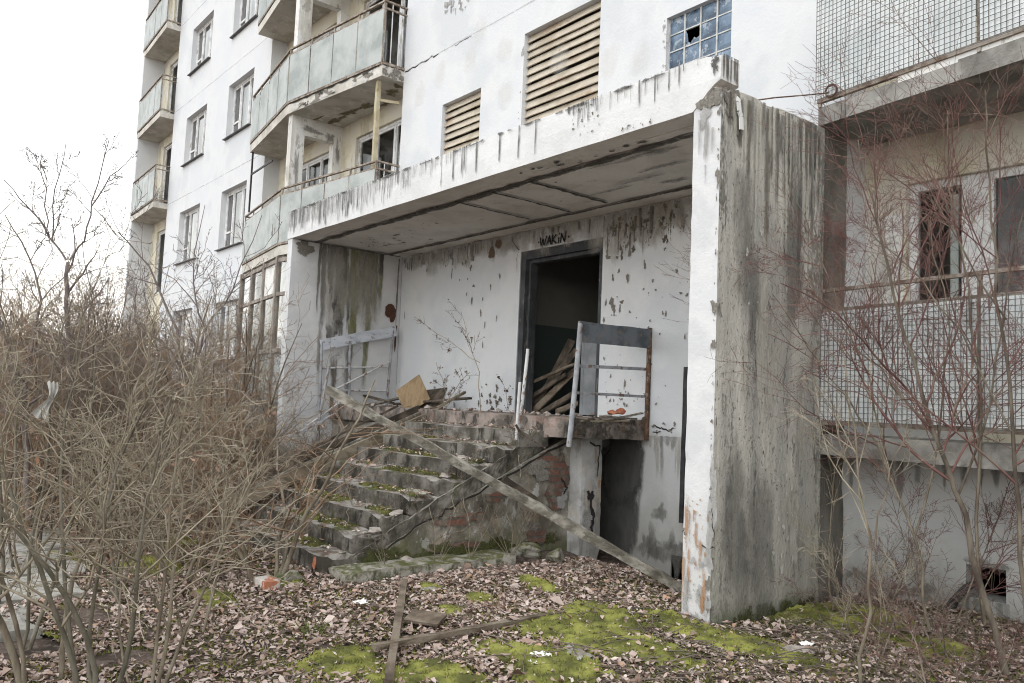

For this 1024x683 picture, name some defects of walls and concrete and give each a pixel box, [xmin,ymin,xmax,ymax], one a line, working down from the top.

spalling [292,88,335,111]
water stain [304,83,402,161]
spalling [352,66,404,86]
water stain [568,64,684,134]
rust [385,259,400,352]
peeling [404,243,500,348]
water stain [288,119,714,408]
peeling [603,296,660,335]
water stain [711,53,828,406]
flaking render [527,452,570,512]
water stain [600,439,683,574]
peeling [683,406,728,621]